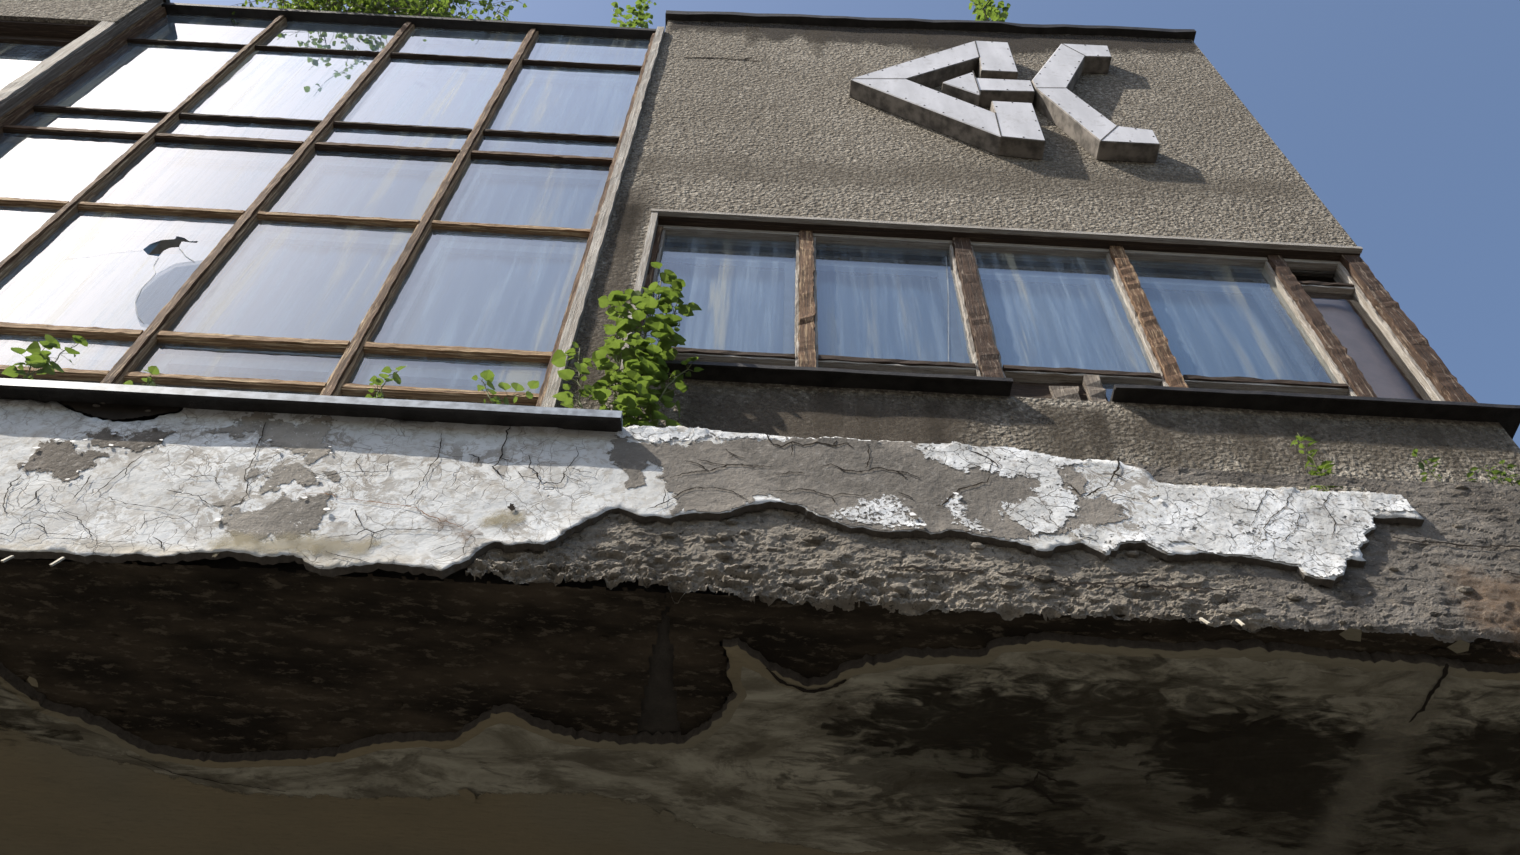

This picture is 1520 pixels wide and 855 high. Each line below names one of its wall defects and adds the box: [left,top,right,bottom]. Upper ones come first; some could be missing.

crack [0,422,281,548]
crack [309,425,591,563]
crack [647,435,998,509]
crack [888,565,1245,593]
crack [1063,457,1140,500]
crack [1228,490,1353,549]
crack [1392,537,1520,575]
spalling [0,401,1520,855]
leakage [0,688,82,741]
leakage [821,677,1520,855]